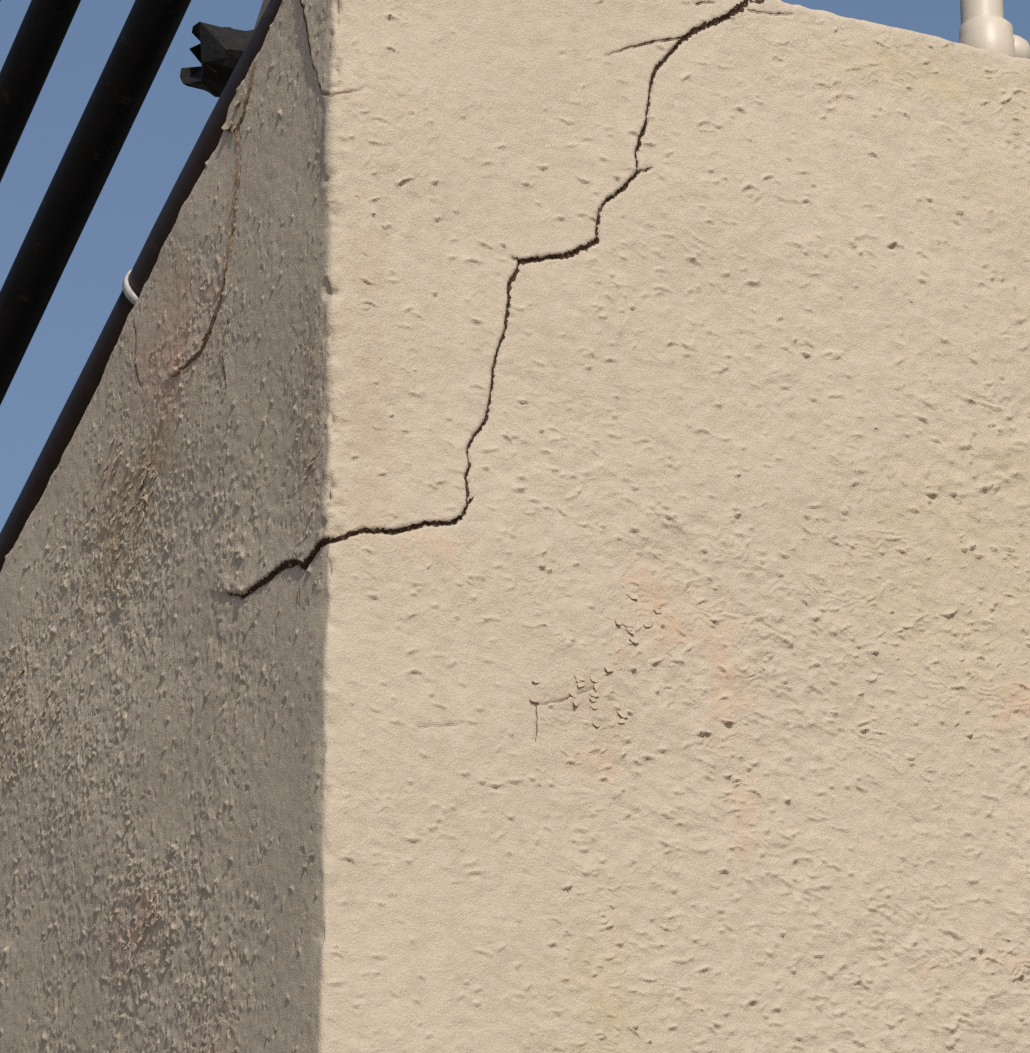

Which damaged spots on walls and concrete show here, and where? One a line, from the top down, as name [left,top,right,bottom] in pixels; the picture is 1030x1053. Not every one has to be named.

crack [172,61,256,382]
crack [226,0,784,708]